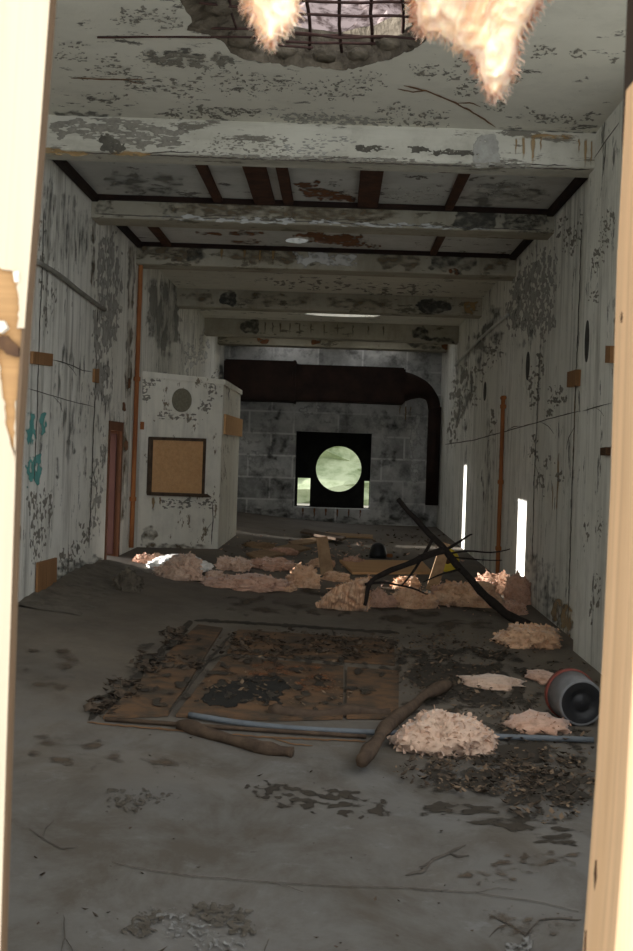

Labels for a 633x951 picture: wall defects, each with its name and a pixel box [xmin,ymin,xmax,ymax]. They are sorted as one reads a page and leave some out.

spalling [49,0,549,169]
peeling [179,214,295,225]
corrosion [294,180,356,202]
peeling [309,219,490,230]
peeling [591,210,615,273]
peeling [91,232,123,407]
peeling [505,214,583,417]
peeling [157,369,222,421]
peeling [447,339,503,443]
peeling [26,488,55,564]
peeling [59,426,107,574]